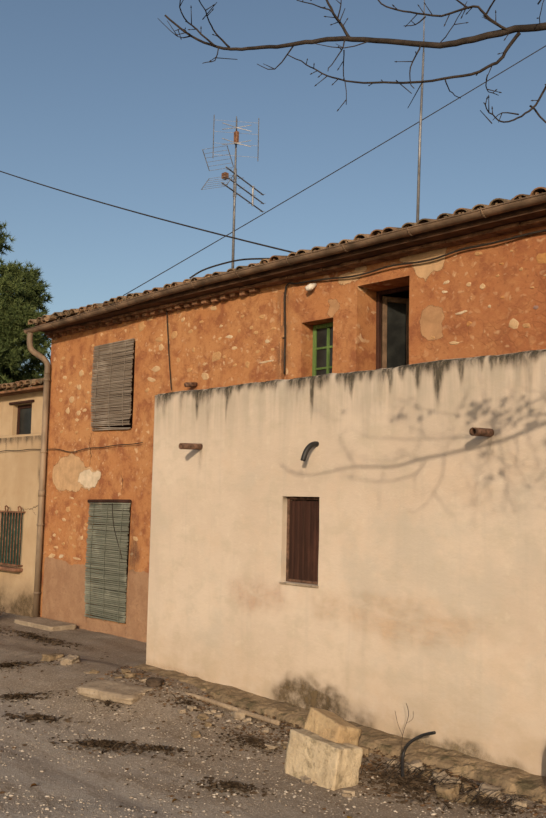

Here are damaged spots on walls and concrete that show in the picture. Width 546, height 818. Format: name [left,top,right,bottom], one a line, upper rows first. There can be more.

peeling [398,247,447,281]
peeling [420,305,459,345]
flaking render [508,318,530,329]
damp [289,374,328,405]
damp [340,370,373,390]
damp [385,350,546,394]
peeling [48,452,101,560]